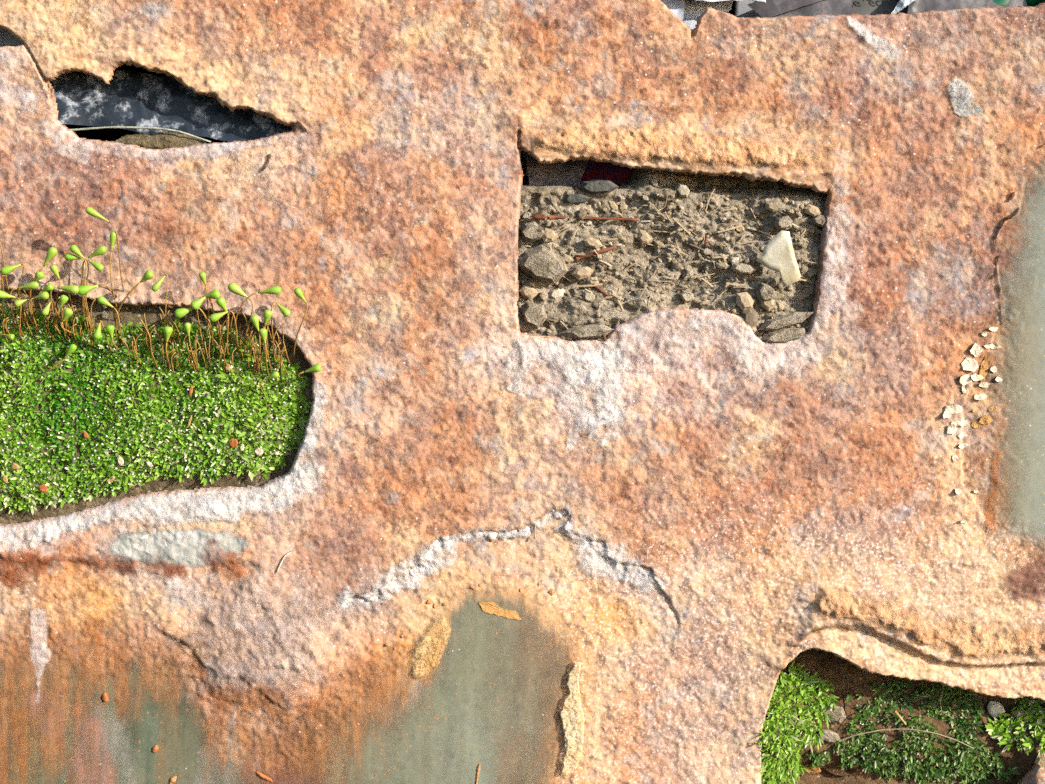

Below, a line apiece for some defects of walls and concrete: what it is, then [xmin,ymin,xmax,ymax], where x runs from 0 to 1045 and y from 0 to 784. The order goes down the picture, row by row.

crack [990,192,1019,325]
corrosion [758,312,813,331]
corrosion [0,552,59,587]
corrosion [79,555,186,578]
leakage [167,576,212,607]
corrosion [210,553,243,577]
corrosion [1006,555,1045,599]
leakage [30,609,51,698]
corrosion [0,619,179,784]
corrosion [208,665,406,784]
peeling [987,701,1005,718]
peeling [1034,753,1045,768]